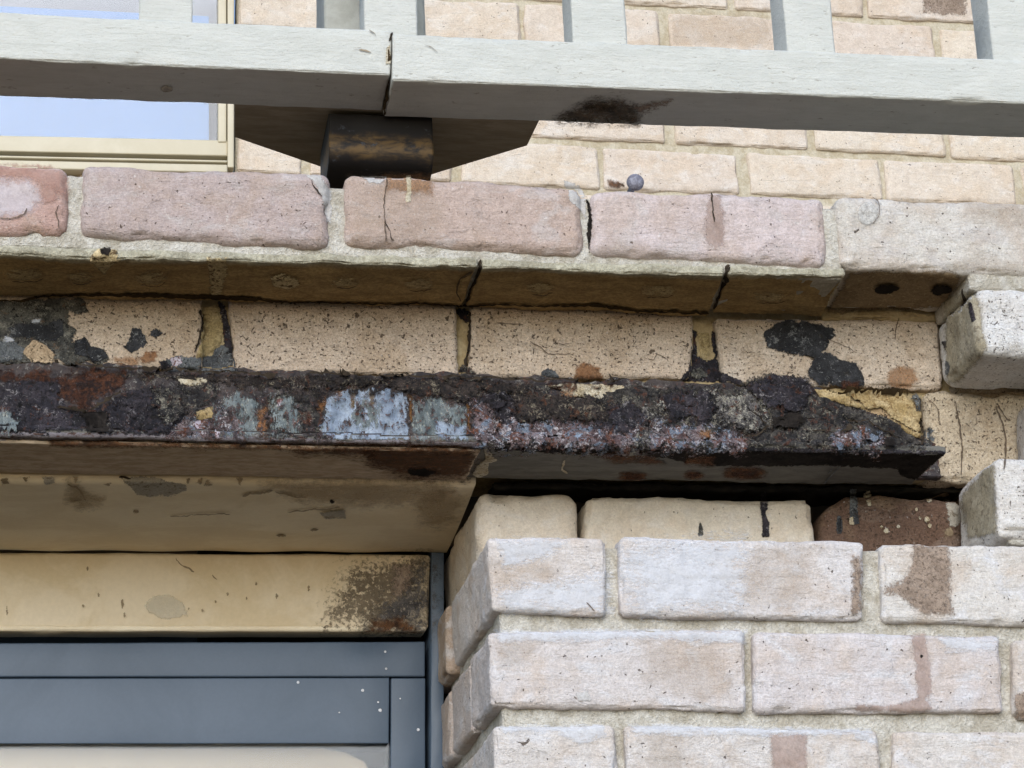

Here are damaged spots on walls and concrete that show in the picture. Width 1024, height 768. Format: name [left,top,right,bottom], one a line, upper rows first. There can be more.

leakage [558,96,671,127]
crack [383,179,392,240]
peeling [0,297,109,365]
peeling [123,328,163,352]
crack [0,259,730,355]
rust [0,351,158,412]
rust [0,362,945,483]
peeling [562,319,932,462]
mould [321,551,436,637]